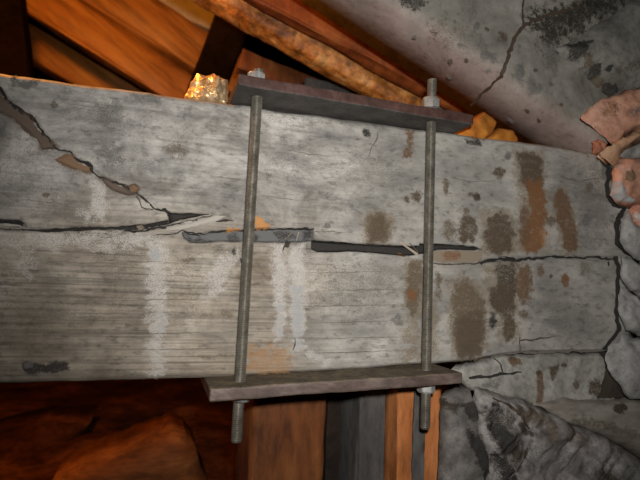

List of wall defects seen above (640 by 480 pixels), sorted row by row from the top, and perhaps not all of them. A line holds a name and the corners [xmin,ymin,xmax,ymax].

crack [470,0,581,106]
damp [0,75,242,379]
crack [0,86,632,395]
damp [431,145,635,361]
corrosion [515,177,578,307]